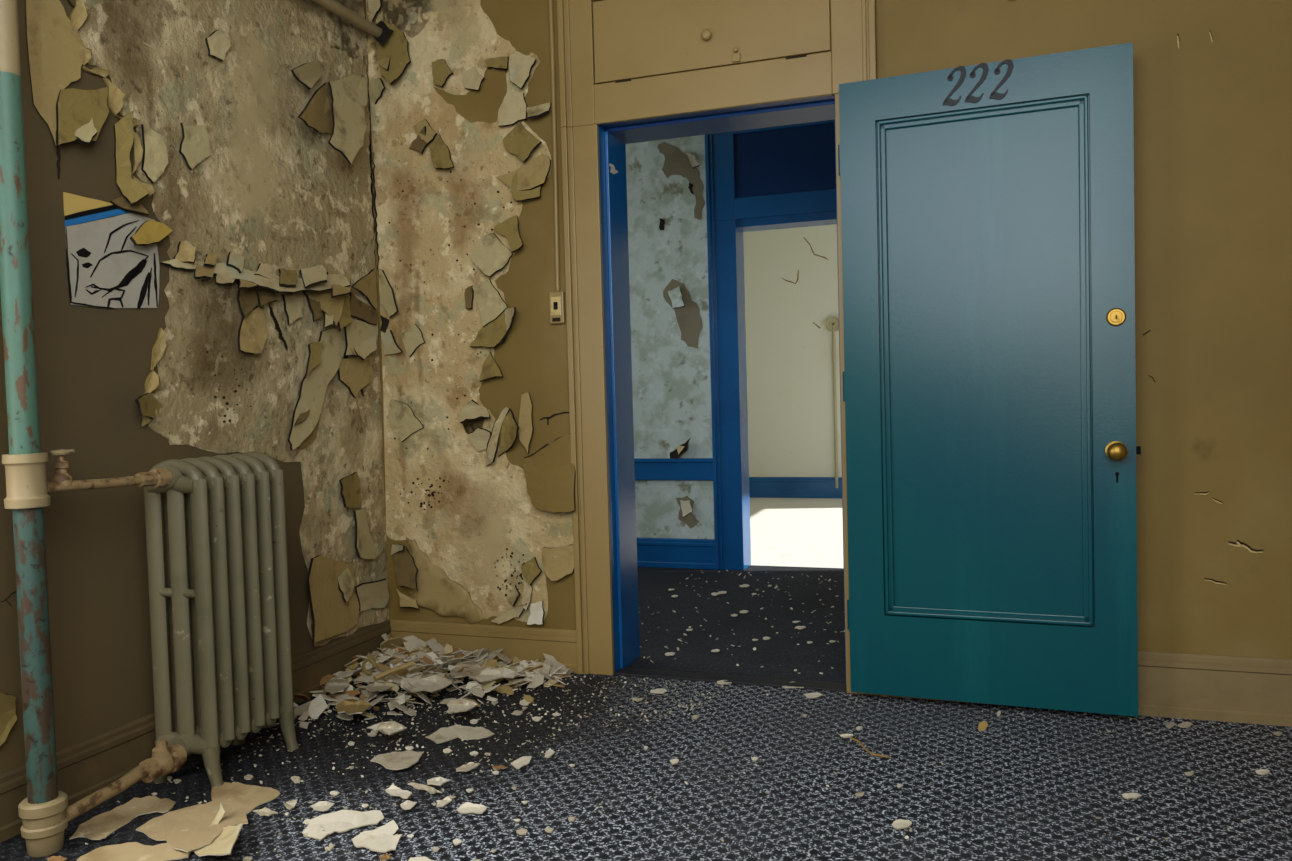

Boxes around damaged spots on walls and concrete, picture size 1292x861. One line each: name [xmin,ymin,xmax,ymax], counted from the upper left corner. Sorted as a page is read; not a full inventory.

peeling [657,142,705,220]
flaking render [25,0,574,647]
peeling [663,279,703,349]
crack [1195,491,1222,504]
crack [1228,540,1264,553]
crack [1204,577,1227,585]
peeling [0,693,17,746]